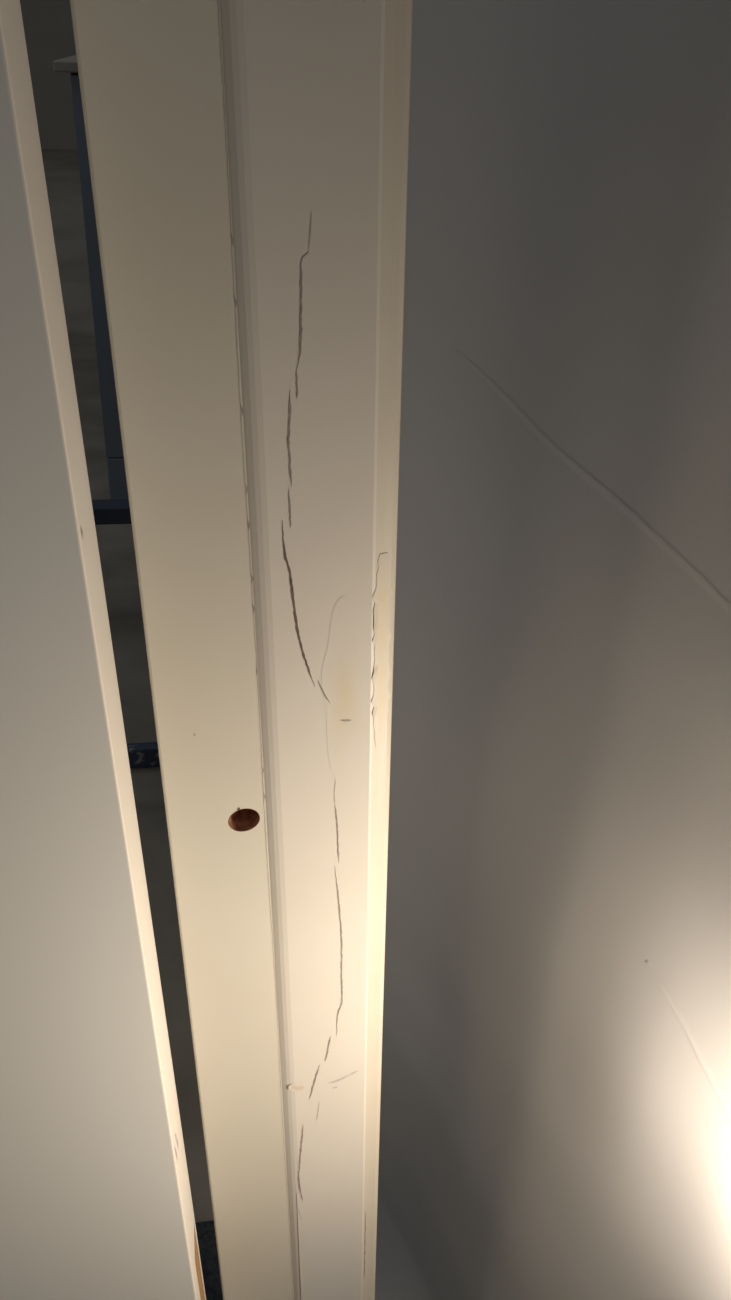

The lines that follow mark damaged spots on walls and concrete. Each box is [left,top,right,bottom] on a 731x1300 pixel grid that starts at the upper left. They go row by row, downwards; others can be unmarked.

crack [218,0,343,1299]